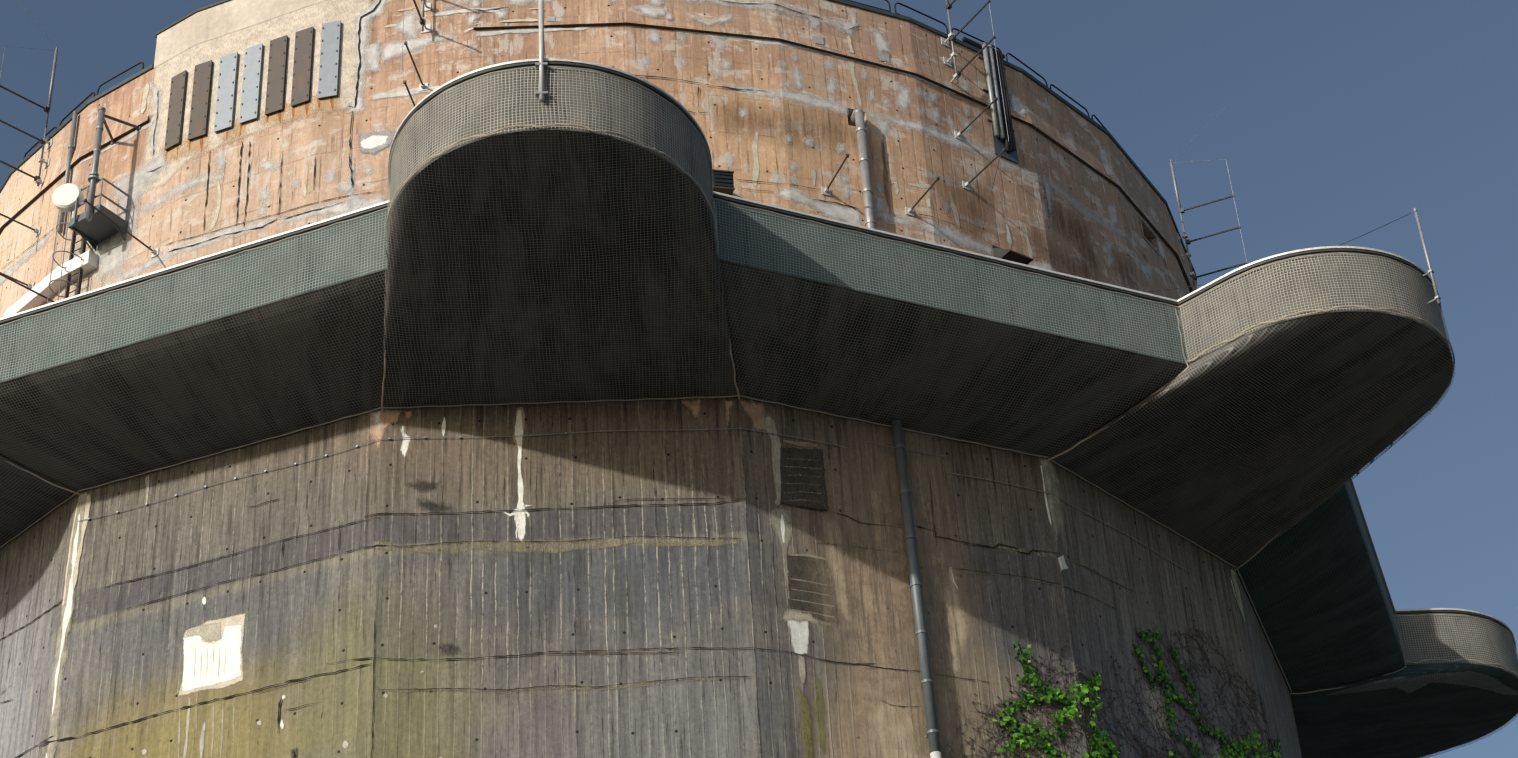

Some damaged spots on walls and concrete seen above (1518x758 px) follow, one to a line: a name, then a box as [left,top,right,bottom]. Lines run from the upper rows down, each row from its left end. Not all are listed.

leakage [504,406,532,540]
leakage [783,449,920,758]
leakage [914,452,969,750]